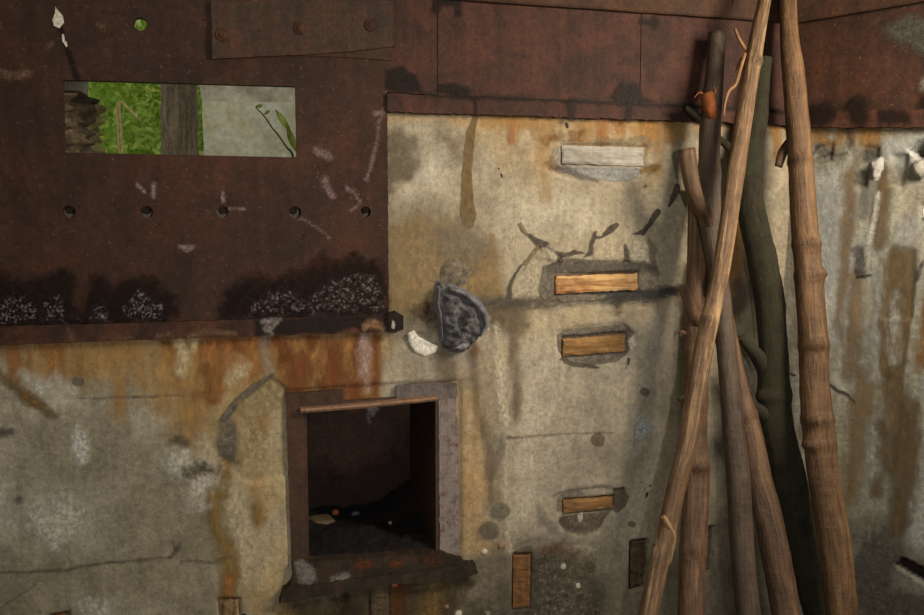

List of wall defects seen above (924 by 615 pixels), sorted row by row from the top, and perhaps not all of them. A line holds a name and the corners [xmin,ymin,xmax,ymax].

rust [0,269,178,341]
rust [220,253,387,318]
crack [508,183,680,298]
rust [729,219,748,319]
rust [272,333,379,400]
leakage [818,166,924,547]